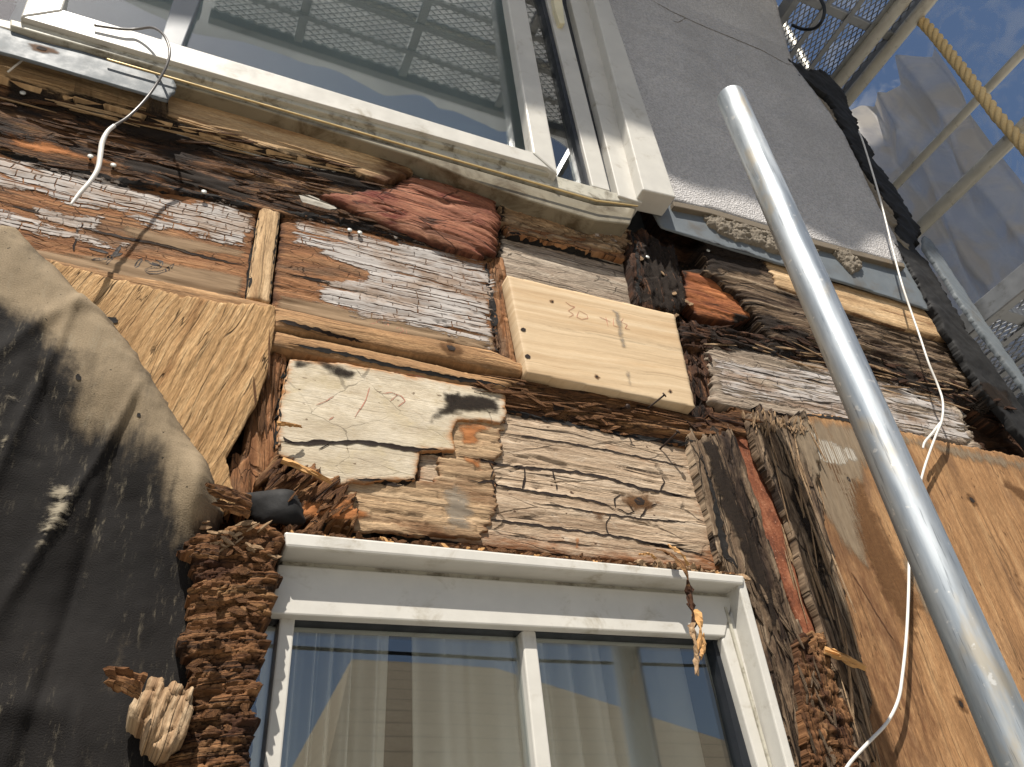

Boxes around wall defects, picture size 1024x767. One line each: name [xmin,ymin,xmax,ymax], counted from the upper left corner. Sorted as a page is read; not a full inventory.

leakage [7,79,386,198]
peeling [0,157,255,298]
peeling [278,195,498,350]
peeling [877,381,972,441]
peeling [302,500,366,519]
crack [279,433,710,557]
leakage [703,440,777,626]